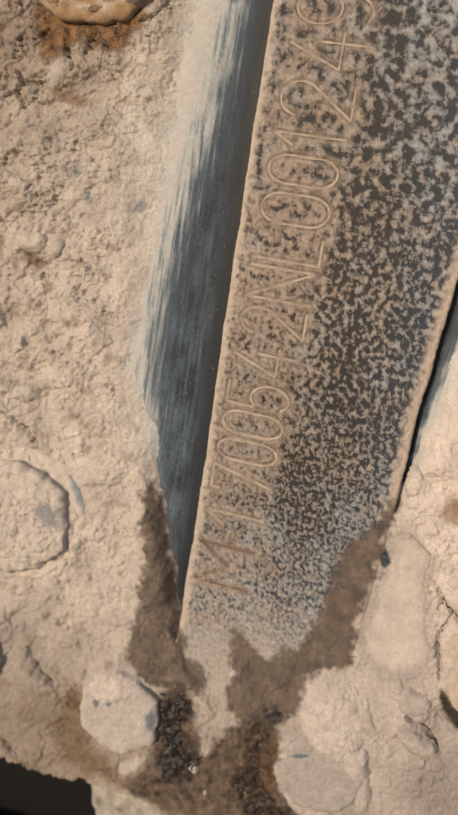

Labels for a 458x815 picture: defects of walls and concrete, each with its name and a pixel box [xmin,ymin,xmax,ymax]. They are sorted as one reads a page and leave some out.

corrosion [34,2,146,58]
damp [126,481,399,815]
crack [438,591,458,676]